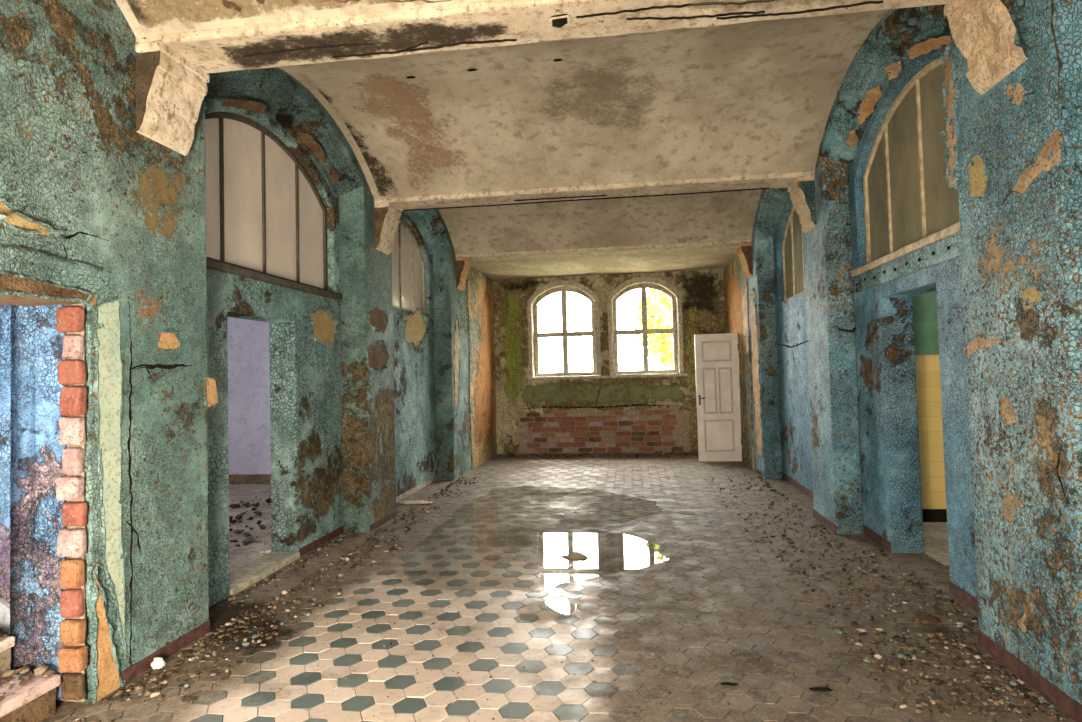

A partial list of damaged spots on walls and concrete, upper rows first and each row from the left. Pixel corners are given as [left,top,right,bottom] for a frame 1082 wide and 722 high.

leakage [222,23,508,70]
crack [389,0,452,8]
crack [576,0,883,20]
peeling [845,36,990,207]
peeling [1006,124,1065,197]
peeling [0,197,70,243]
crack [62,232,109,258]
peeling [129,159,188,257]
peeling [971,210,1051,315]
peeling [156,329,182,354]
leakage [502,273,718,407]
flaking render [0,270,161,704]